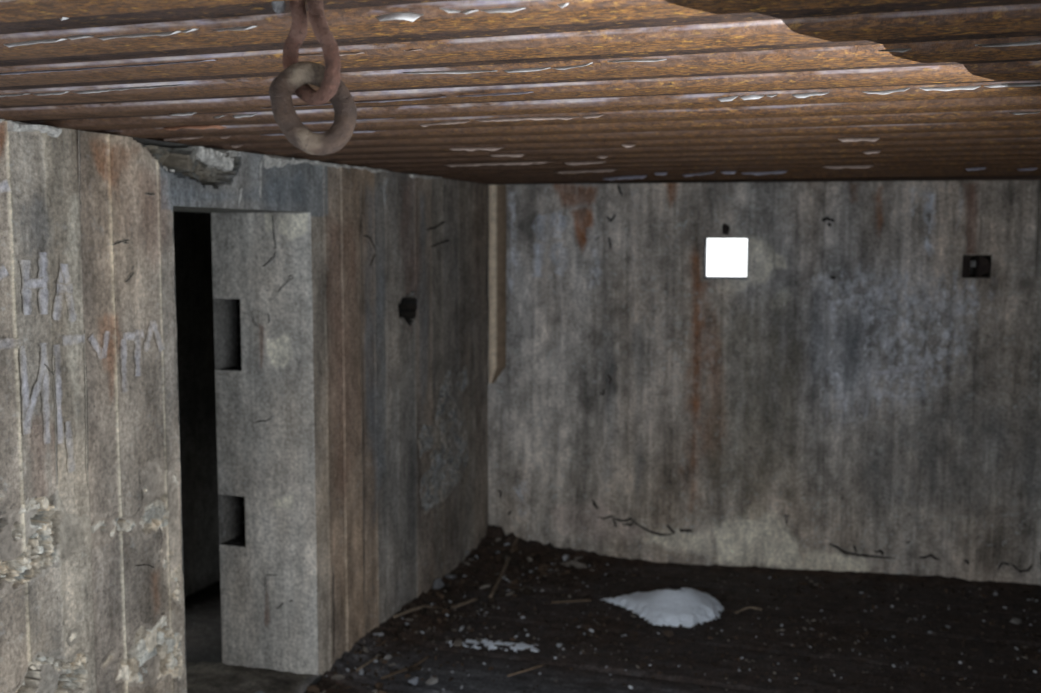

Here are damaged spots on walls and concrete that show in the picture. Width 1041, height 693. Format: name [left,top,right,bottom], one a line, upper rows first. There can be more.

peeling [863,83,1041,95]
crack [591,499,692,537]
spalling [0,456,185,693]
crack [828,540,970,565]
crack [997,552,1041,574]